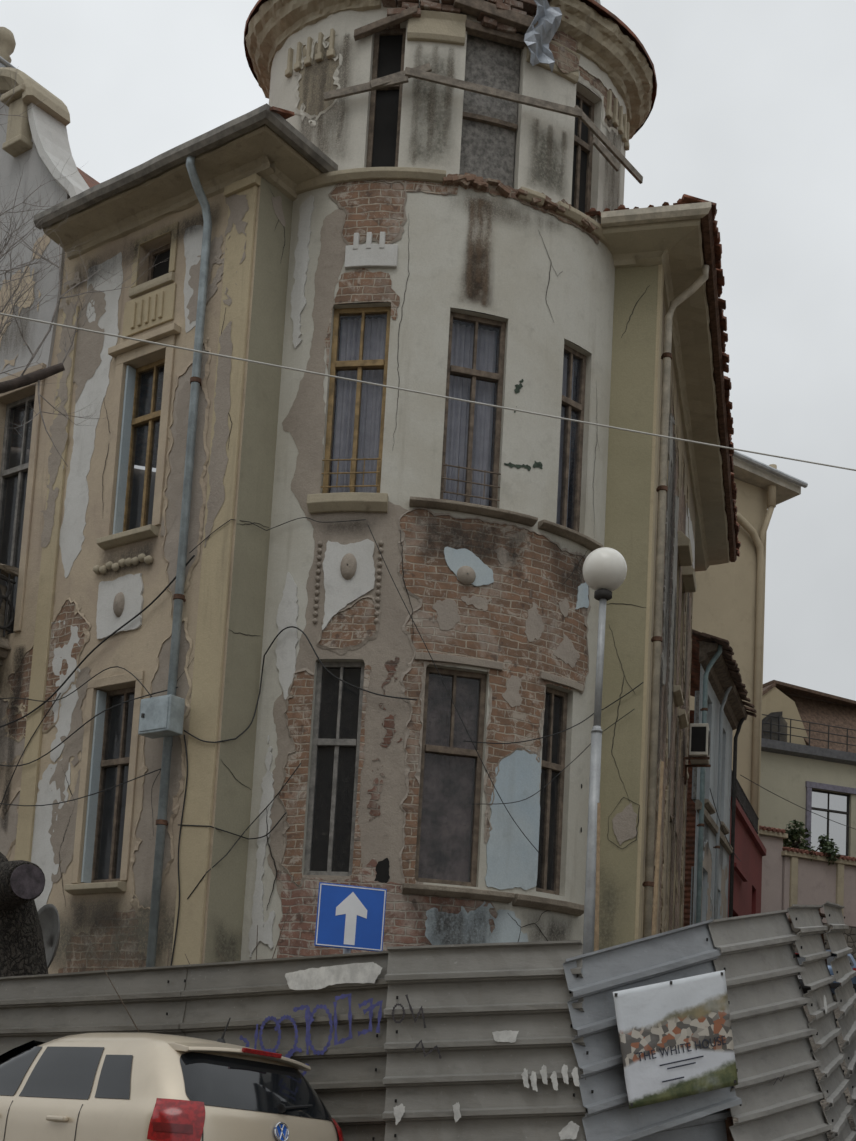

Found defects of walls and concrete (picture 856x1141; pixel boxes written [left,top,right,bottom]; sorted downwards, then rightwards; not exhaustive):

peeling [290,195,314,349]
flaking render [325,268,400,369]
flaking render [328,172,601,245]
flaking render [248,507,591,958]
flaking render [651,385,728,934]